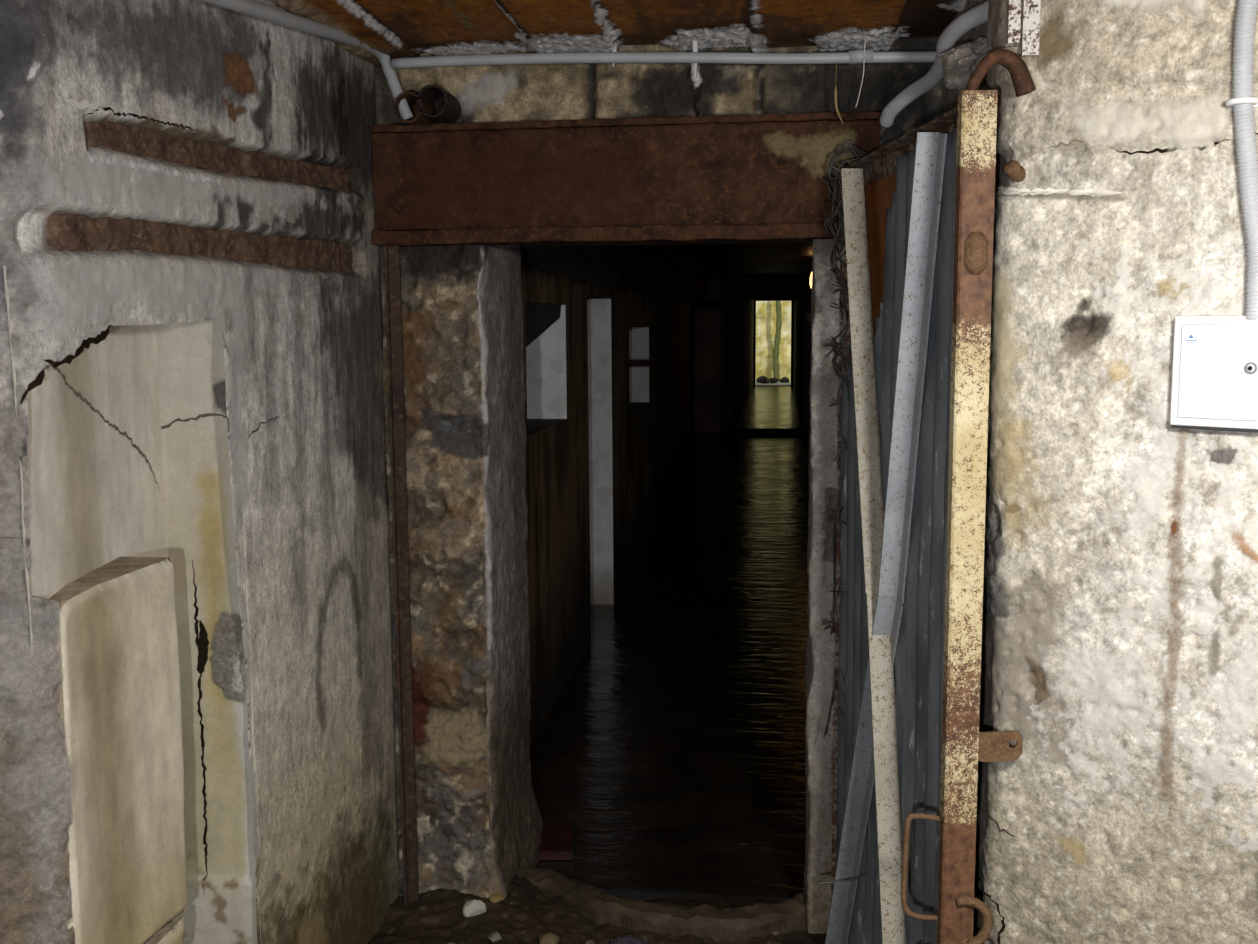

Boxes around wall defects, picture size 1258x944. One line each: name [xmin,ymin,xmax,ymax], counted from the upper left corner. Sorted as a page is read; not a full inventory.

damp [0,0,273,148]
spalling [123,118,235,146]
spalling [222,52,259,122]
damp [213,48,377,241]
crack [1047,133,1258,155]
damp [1062,299,1110,363]
crack [19,325,280,491]
spalling [210,612,247,702]
crack [144,561,209,944]